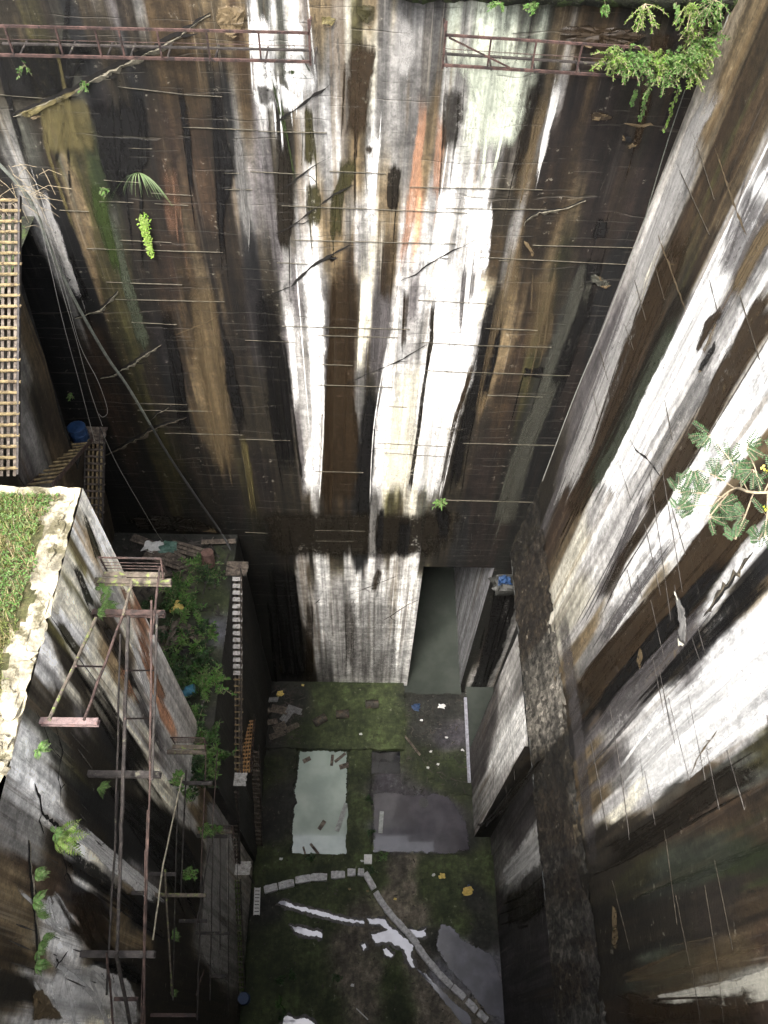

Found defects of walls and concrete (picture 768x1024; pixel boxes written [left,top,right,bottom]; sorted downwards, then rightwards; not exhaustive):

water stain [112,100,143,261]
rust [401,125,425,261]
crack [270,245,349,296]
water stain [248,0,502,576]
crack [403,240,474,280]
water stain [372,570,382,593]
crack [703,552,753,617]